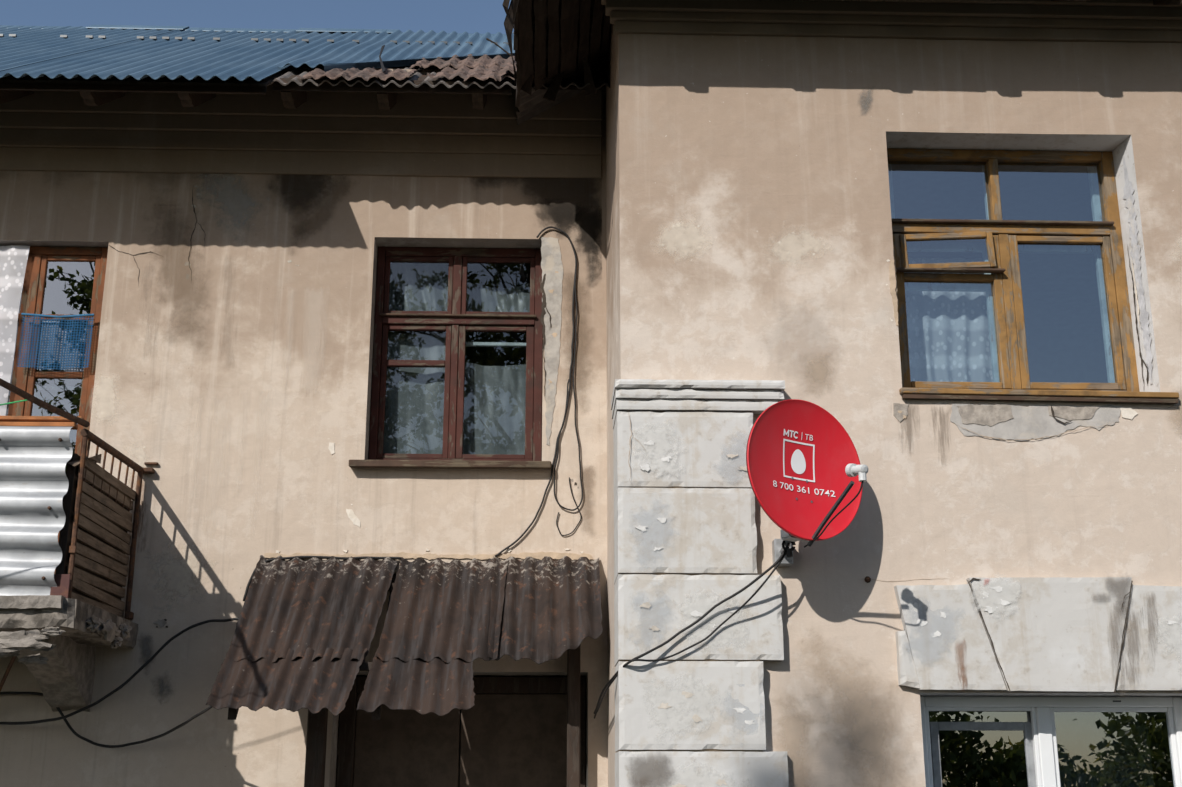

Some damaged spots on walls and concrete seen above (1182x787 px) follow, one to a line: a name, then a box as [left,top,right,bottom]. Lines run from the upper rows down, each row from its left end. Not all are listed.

water stain [277,175,326,209]
crack [109,185,205,286]
spalling [950,403,1138,441]
water stain [1099,578,1128,609]
spalling [0,626,66,665]
crack [1114,581,1133,693]